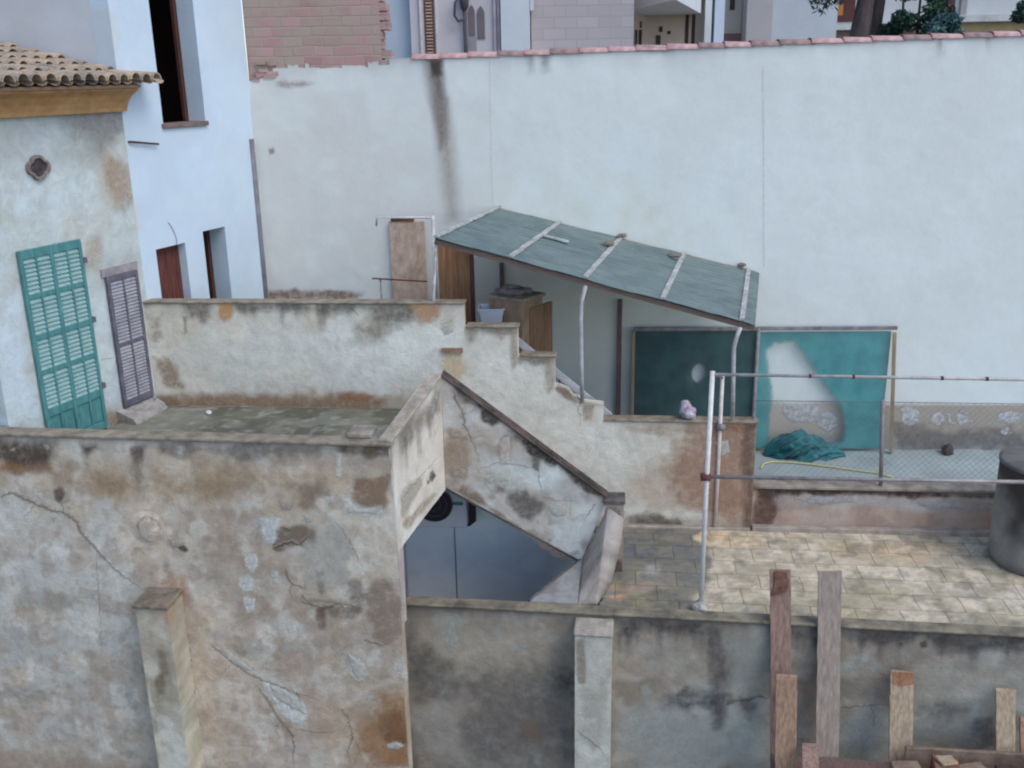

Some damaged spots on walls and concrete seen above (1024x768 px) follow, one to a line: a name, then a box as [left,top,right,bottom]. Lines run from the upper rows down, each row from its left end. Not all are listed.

spalling [251,61,278,81]
water stain [430,61,449,167]
peeling [783,404,839,431]
peeling [900,405,973,426]
peeling [995,411,1022,434]
crack [2,492,141,588]
spalling [259,502,315,551]
crack [286,570,361,620]
water stain [650,621,726,722]
crack [211,644,319,752]